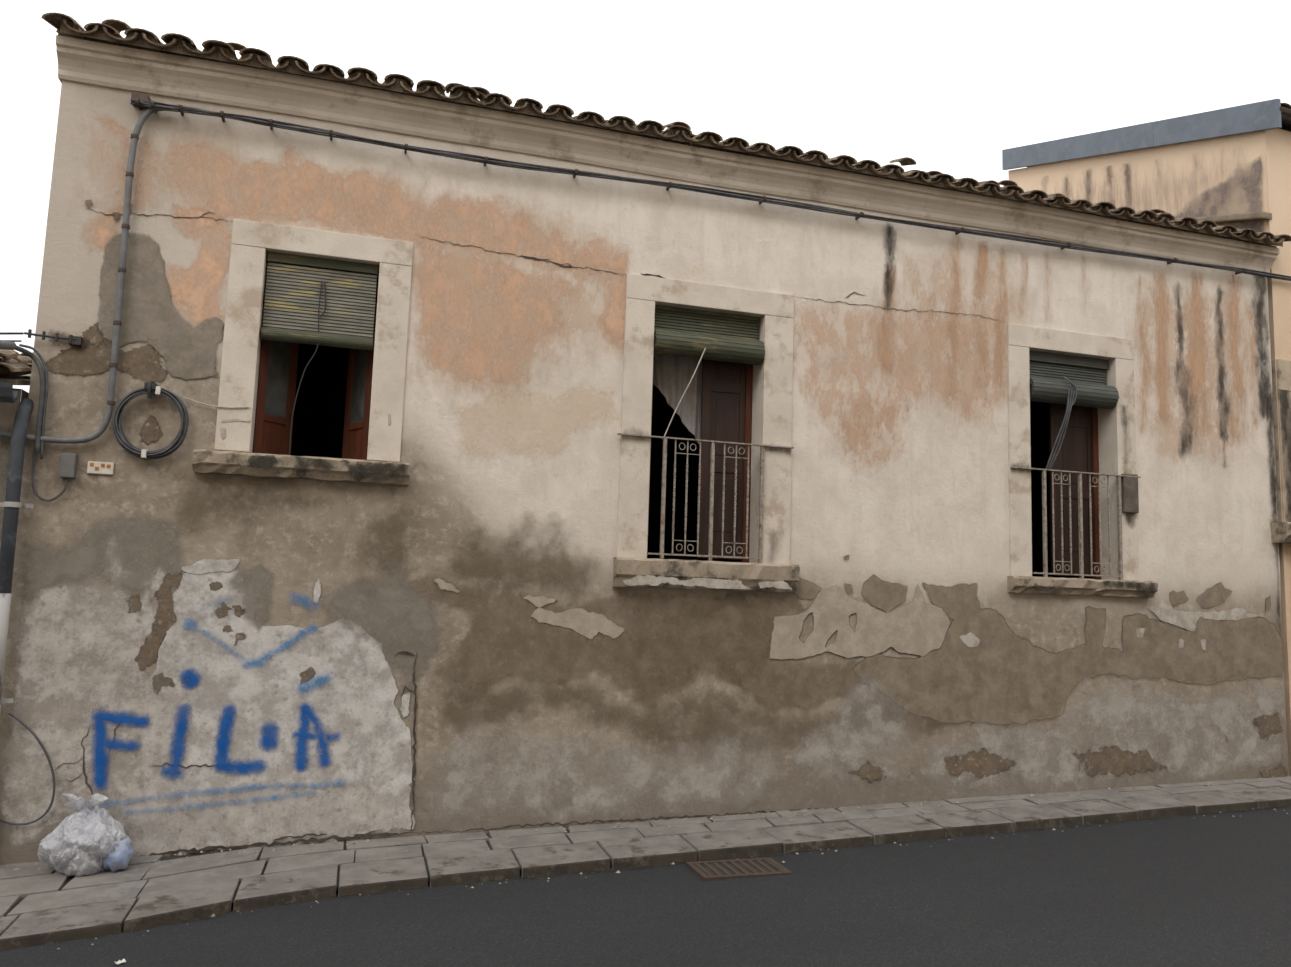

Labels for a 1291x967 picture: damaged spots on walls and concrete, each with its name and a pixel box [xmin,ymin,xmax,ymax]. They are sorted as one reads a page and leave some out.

crack [86,208,233,222]
leakage [1175,159,1263,232]
leakage [886,225,895,307]
spalling [45,322,167,382]
leakage [1253,276,1291,523]
flaking render [125,559,416,857]
peeling [523,595,625,640]
leakage [329,515,941,820]
peeling [622,575,822,600]
flaking render [844,575,1283,725]
leakage [923,687,1282,788]
spalling [1073,746,1167,777]